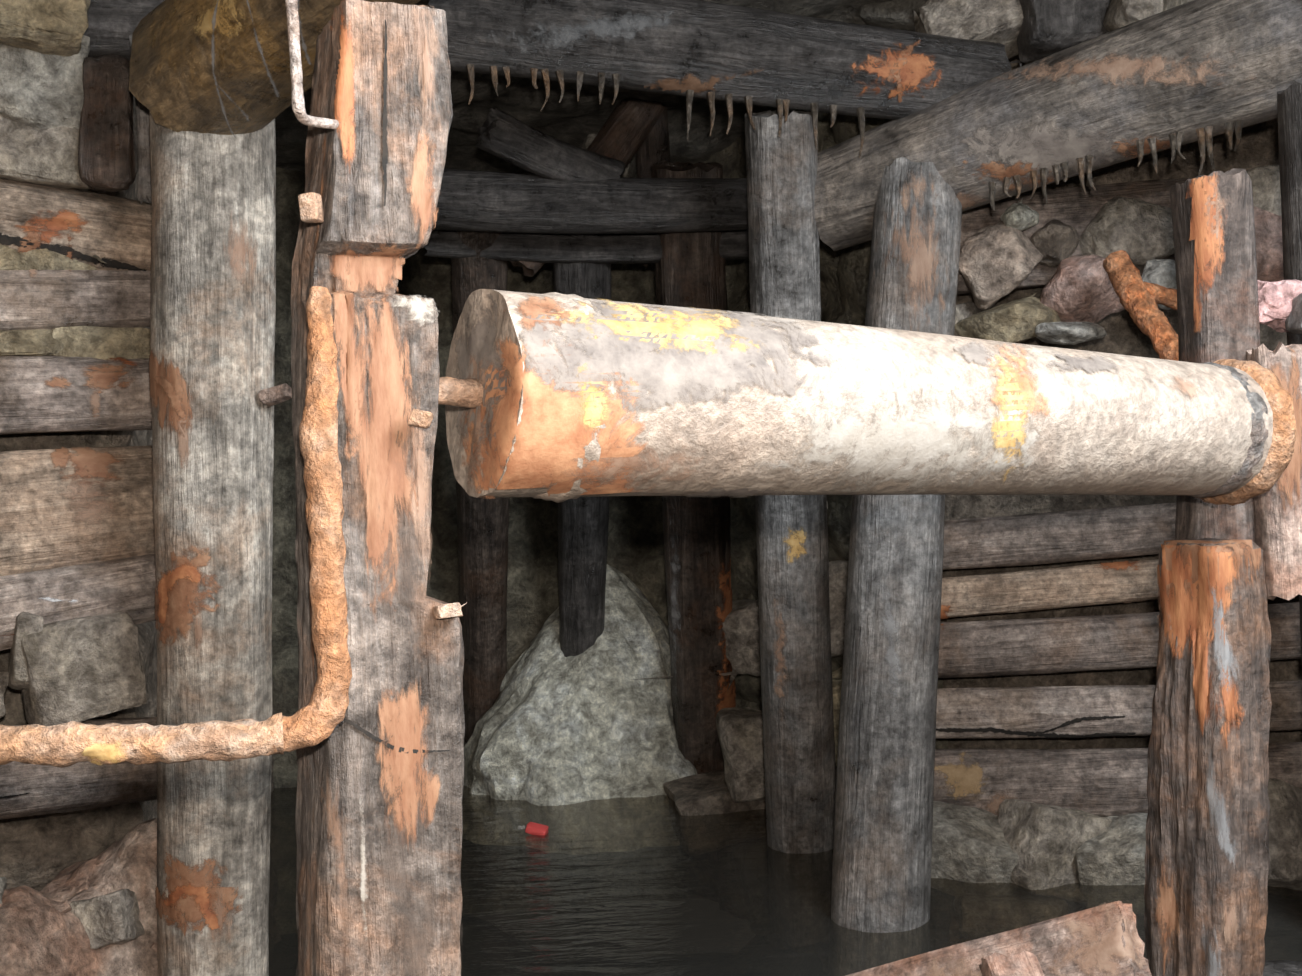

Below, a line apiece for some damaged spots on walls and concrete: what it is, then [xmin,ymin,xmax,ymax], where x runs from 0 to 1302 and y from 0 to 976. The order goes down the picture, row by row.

rust [644,69,762,94]
rust [964,160,1054,190]
crack [0,233,146,271]
rust [45,350,193,467]
rust [50,447,122,521]
rust [155,546,220,647]